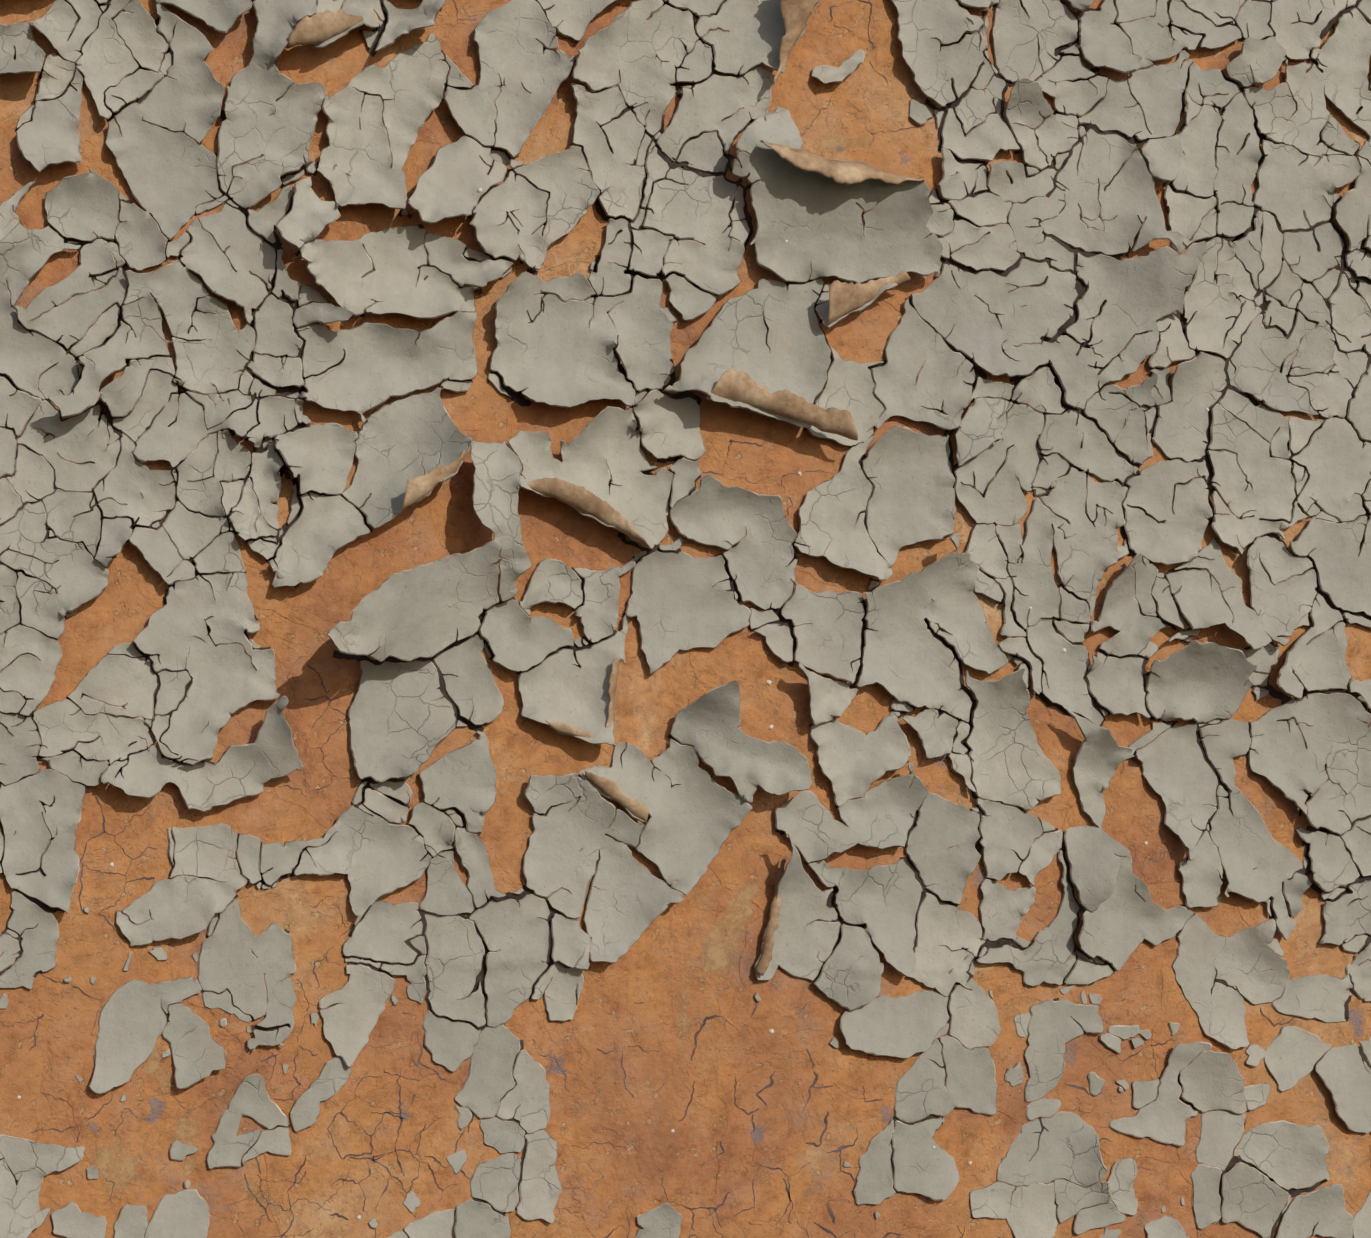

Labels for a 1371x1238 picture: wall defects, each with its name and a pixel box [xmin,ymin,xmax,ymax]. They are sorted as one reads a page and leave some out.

crack [359,1,387,57]
crack [398,0,765,430]
crack [785,277,833,431]
crack [0,0,374,1067]
peeling [0,0,812,1238]
crack [197,559,627,861]
crack [609,360,887,689]
crack [865,0,1371,1084]
crack [200,885,585,1238]
crack [799,861,866,1011]
crack [1120,1039,1196,1110]
crack [1219,1117,1327,1238]